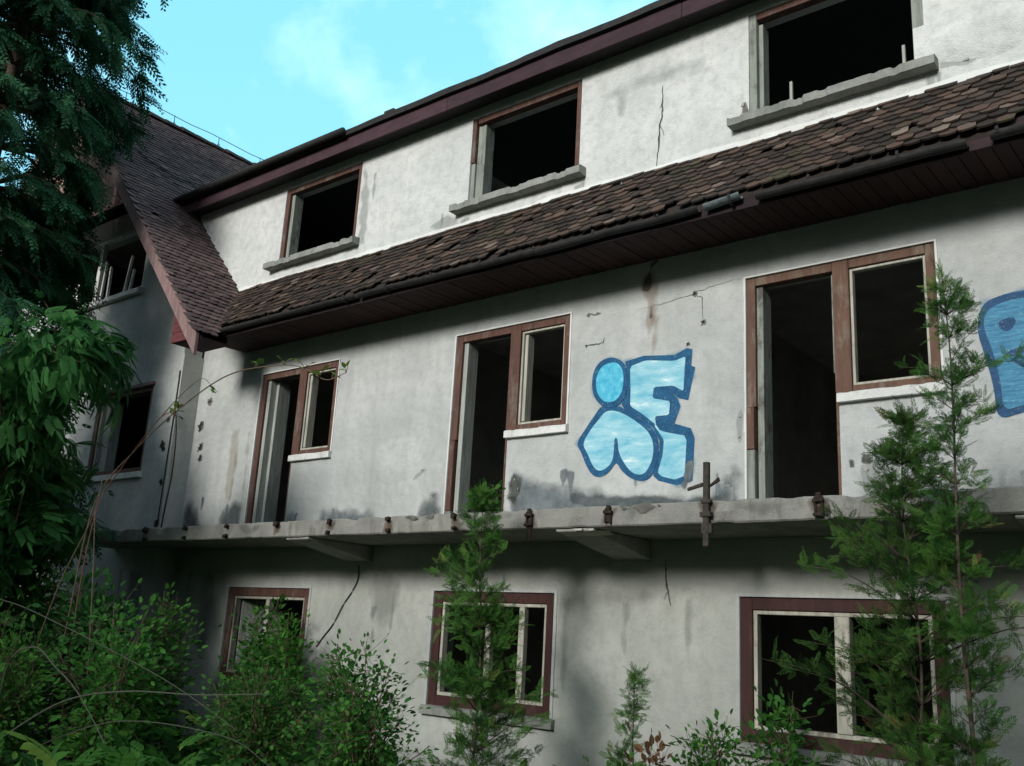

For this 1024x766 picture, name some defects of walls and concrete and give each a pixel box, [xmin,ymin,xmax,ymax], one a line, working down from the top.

crack [656,85,664,166]
corrosion [643,260,658,291]
damp [681,461,693,488]
damp [508,469,735,512]
damp [184,497,204,526]
damp [221,503,240,524]